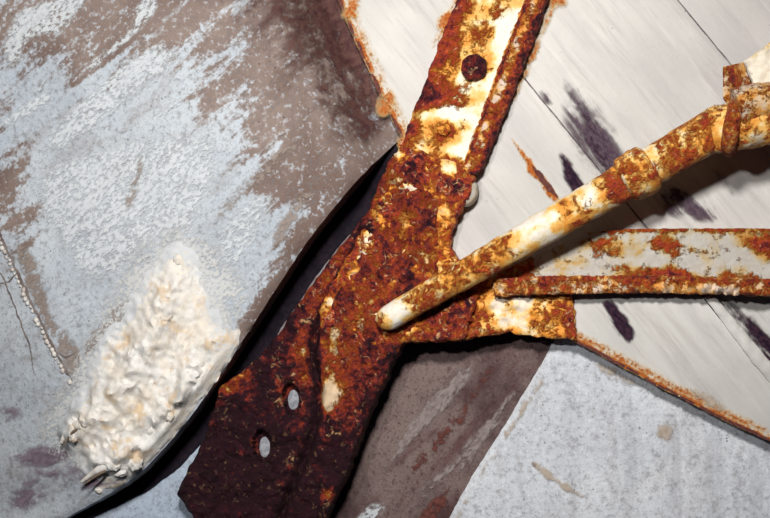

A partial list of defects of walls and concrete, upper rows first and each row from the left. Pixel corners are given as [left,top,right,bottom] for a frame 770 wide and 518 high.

corrosion [438,0,457,38]
corrosion [544,0,566,29]
corrosion [338,0,407,147]
corrosion [513,140,559,201]
crack [0,233,78,385]
leakage [10,229,247,508]
corrosion [412,371,489,471]
corrosion [572,333,770,441]
leakage [729,303,770,360]